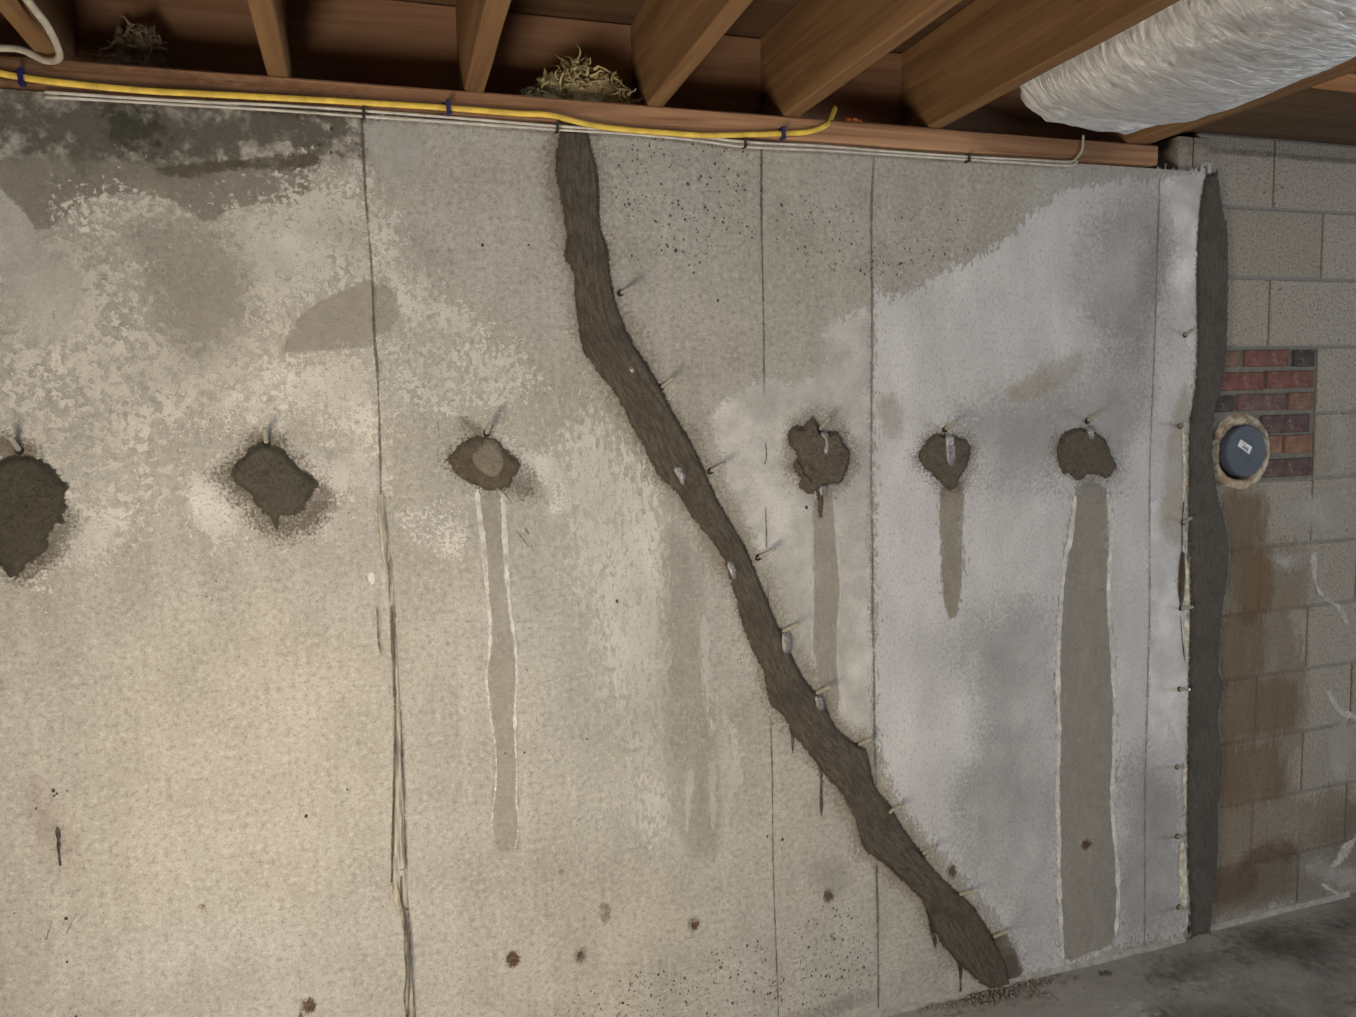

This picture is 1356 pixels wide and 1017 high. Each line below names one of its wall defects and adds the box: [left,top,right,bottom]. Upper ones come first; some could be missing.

crack [758,149,766,392]
crack [867,188,875,331]
damp [0,68,744,880]
crack [868,524,876,617]
damp [709,163,1215,976]
crack [376,606,415,1017]
crack [770,716,779,1017]
crack [871,662,879,764]
crack [873,865,881,1008]